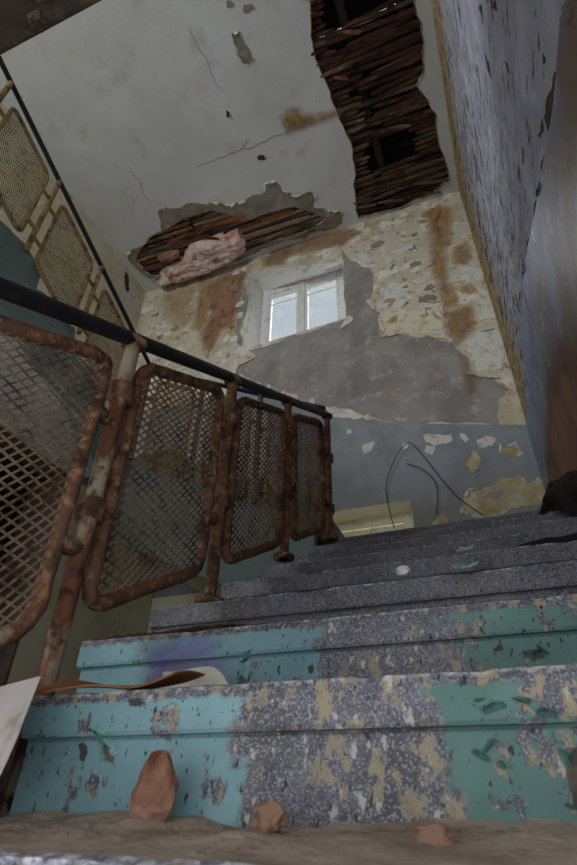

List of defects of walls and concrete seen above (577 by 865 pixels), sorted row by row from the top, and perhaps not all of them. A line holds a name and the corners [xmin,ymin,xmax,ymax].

peeling [226,0,256,13]
peeling [229,31,254,66]
peeling [538,71,556,138]
crack [198,113,332,167]
flaking render [122,179,345,286]
damp [196,272,244,350]
peeling [230,96,523,473]
damp [429,207,471,340]
peeling [458,475,545,518]
peeling [472,696,556,719]
peeling [78,722,118,765]
peeling [556,747,577,810]